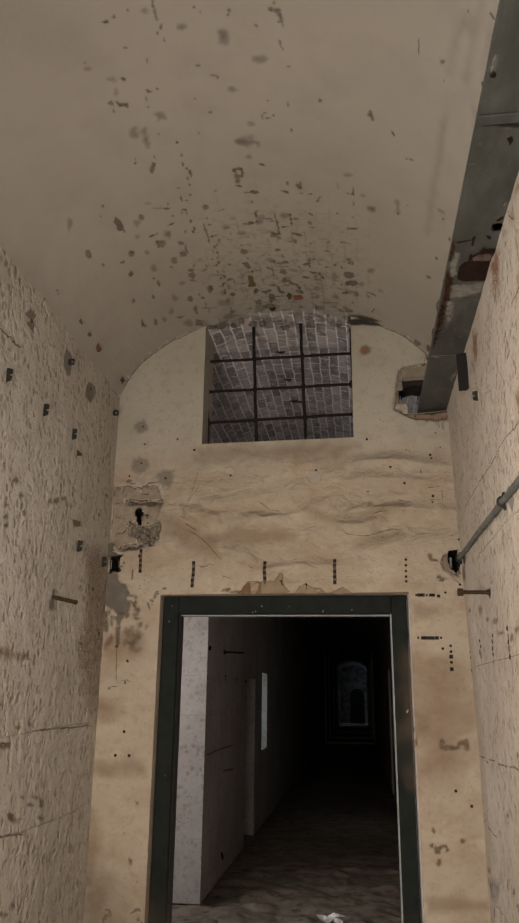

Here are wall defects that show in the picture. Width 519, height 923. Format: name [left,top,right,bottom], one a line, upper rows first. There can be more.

peeling [436,252,483,323]
corrosion [433,216,504,348]
spalling [395,339,448,421]
crack [463,412,519,514]
spalling [104,479,169,632]
peeling [222,573,351,594]
crack [31,724,92,732]